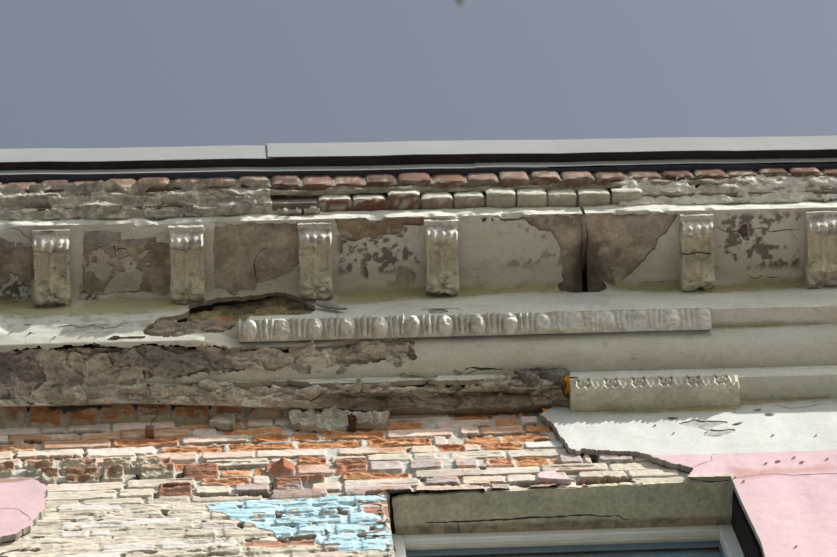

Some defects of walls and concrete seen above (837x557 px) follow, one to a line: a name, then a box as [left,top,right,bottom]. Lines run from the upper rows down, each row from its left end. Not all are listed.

peeling [335,218,424,241]
peeling [482,173,837,293]
crack [717,227,800,242]
peeling [82,230,171,296]
peeling [360,253,371,278]
peeling [144,222,347,338]
flaking render [393,359,438,387]
peeling [514,367,570,385]
peeling [668,417,741,437]
flaking render [0,399,690,557]
crack [426,514,630,533]